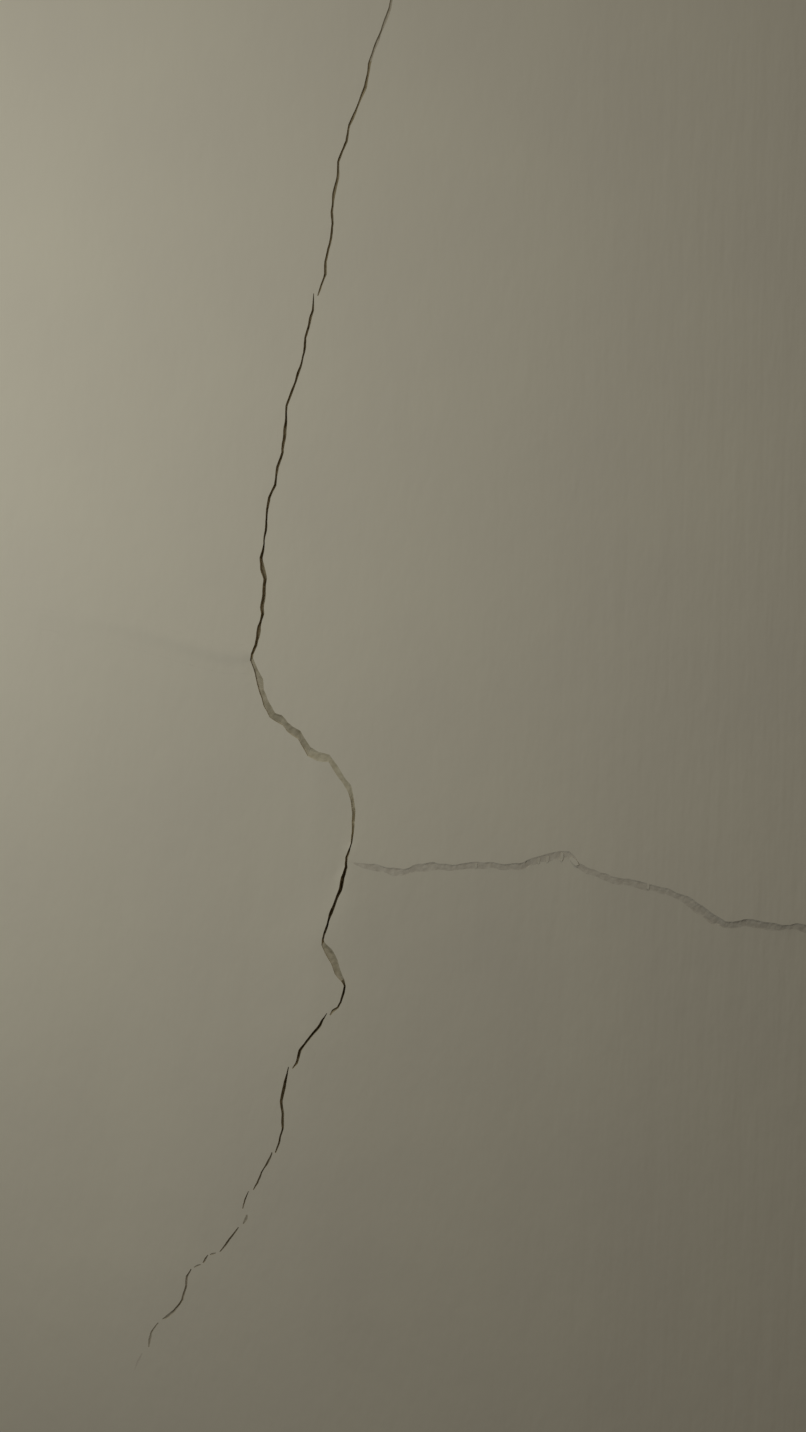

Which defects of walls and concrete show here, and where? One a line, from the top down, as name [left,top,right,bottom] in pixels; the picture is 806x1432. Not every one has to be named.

crack [134,0,806,1370]